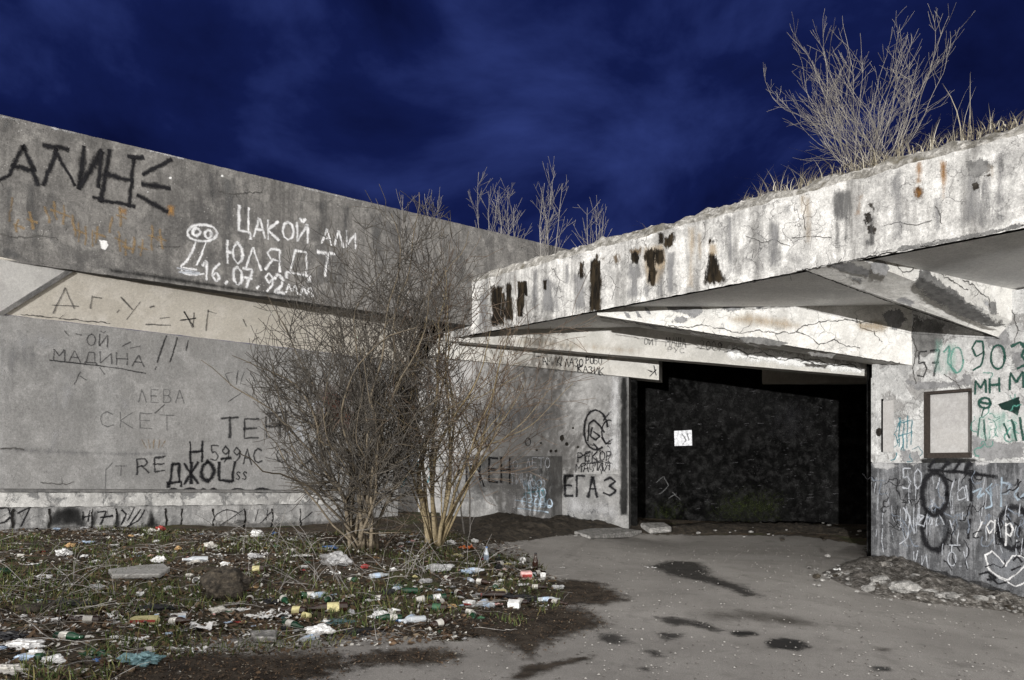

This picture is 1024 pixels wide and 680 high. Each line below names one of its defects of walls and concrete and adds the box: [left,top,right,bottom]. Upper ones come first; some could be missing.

damp [834,191,851,242]
damp [480,272,557,326]
damp [566,254,602,312]
damp [628,232,676,296]
crack [601,196,1024,384]